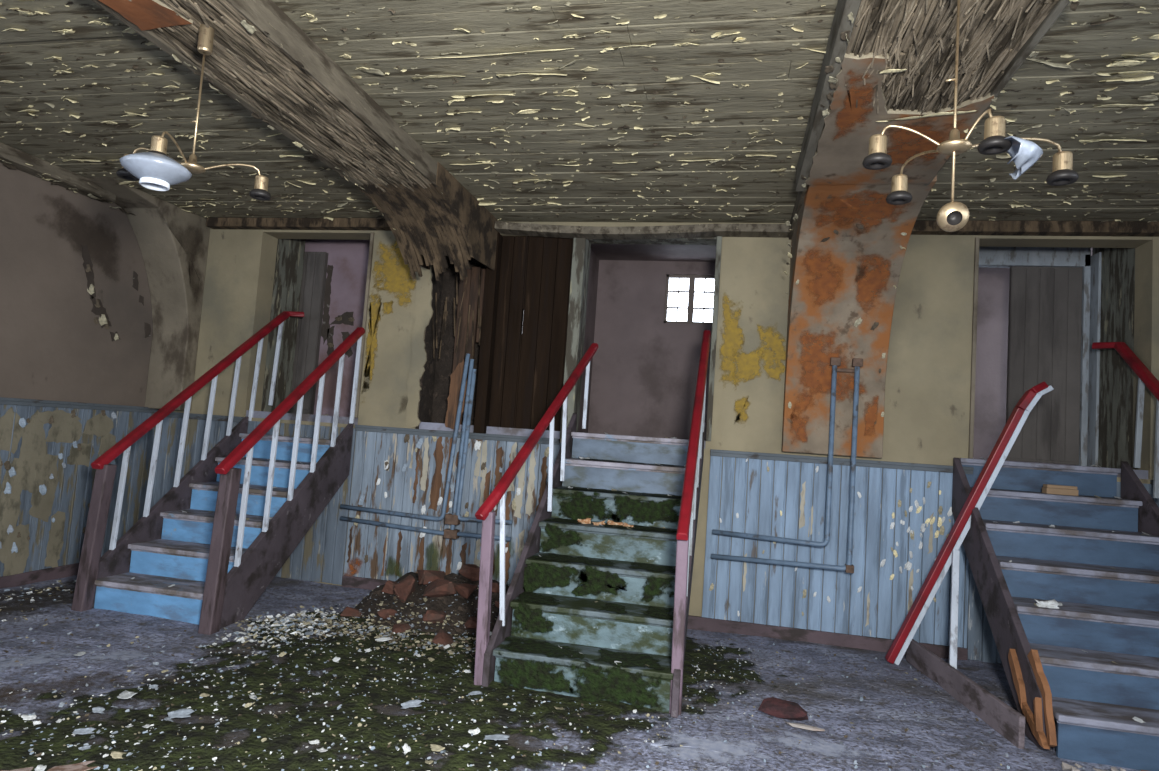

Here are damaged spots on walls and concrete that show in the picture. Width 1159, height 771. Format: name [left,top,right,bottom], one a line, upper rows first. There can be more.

peeling [0,0,395,230]
peeling [300,0,907,305]
rust [834,70,877,139]
rust [880,119,967,171]
peeling [922,0,1159,222]
spalling [854,255,897,330]
spalling [376,256,549,584]
spalling [788,331,884,443]
peeling [0,407,117,576]
rust [345,558,362,576]
peeling [347,495,368,563]